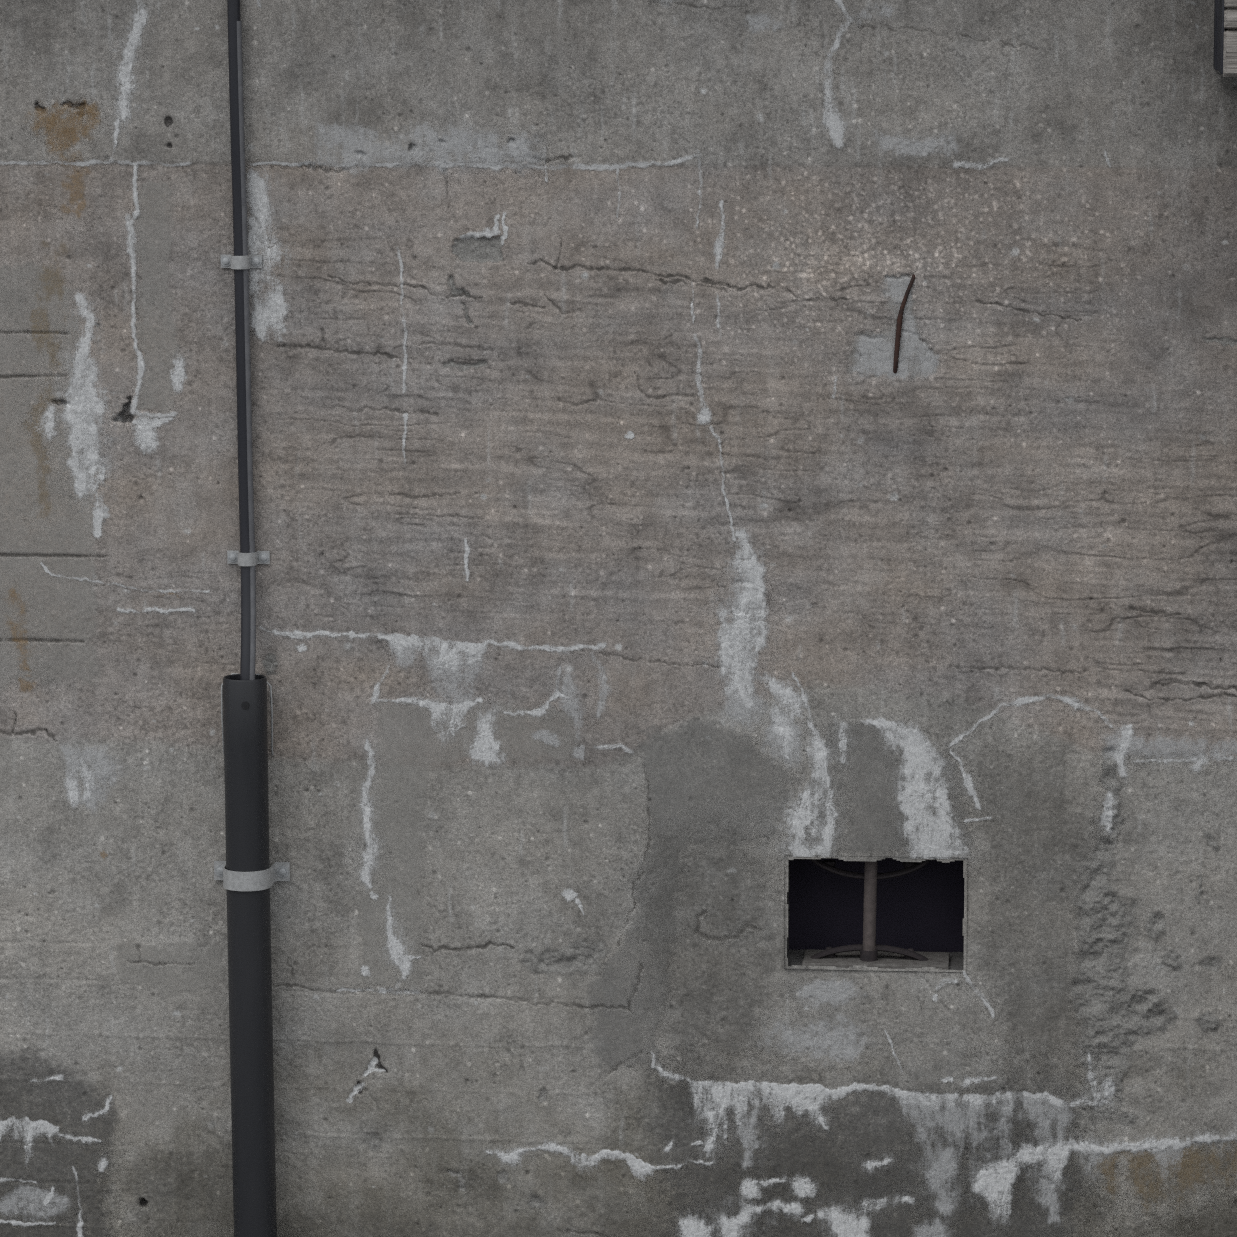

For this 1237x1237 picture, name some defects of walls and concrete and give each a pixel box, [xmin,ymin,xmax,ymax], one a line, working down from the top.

crack [533,244,850,300]
crack [976,300,1081,321]
damp [39,293,112,537]
damp [691,299,847,857]
damp [260,627,632,767]
damp [861,718,968,859]
damp [1101,791,1115,833]
damp [1106,724,1237,777]
spalling [1071,749,1178,1126]
damp [0,1167,83,1237]
damp [0,1117,101,1162]
damp [486,1053,1237,1237]